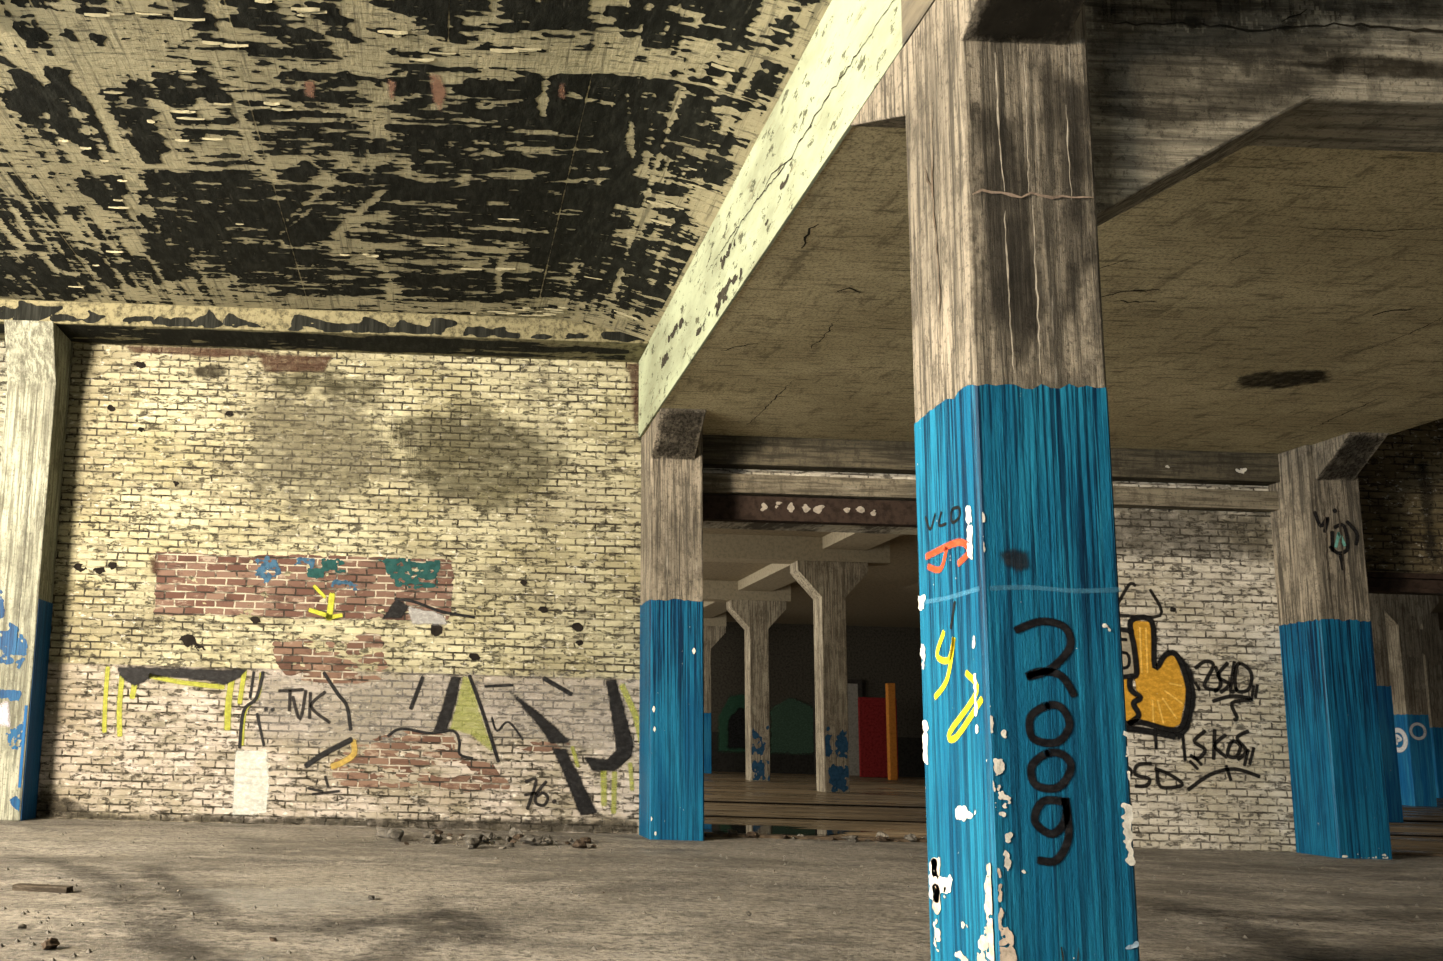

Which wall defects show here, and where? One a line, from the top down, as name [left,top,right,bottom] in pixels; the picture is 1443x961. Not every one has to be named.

leakage [969,0,1443,230]
peeling [0,0,820,369]
leakage [973,109,1041,360]
leakage [1065,252,1091,310]
leakage [275,372,372,396]
leakage [394,410,563,512]
spalling [74,562,117,574]
peeling [965,506,985,560]
leakage [1419,462,1436,561]
peeling [973,673,1007,738]
peeling [929,758,1026,961]
peeling [1121,803,1135,866]